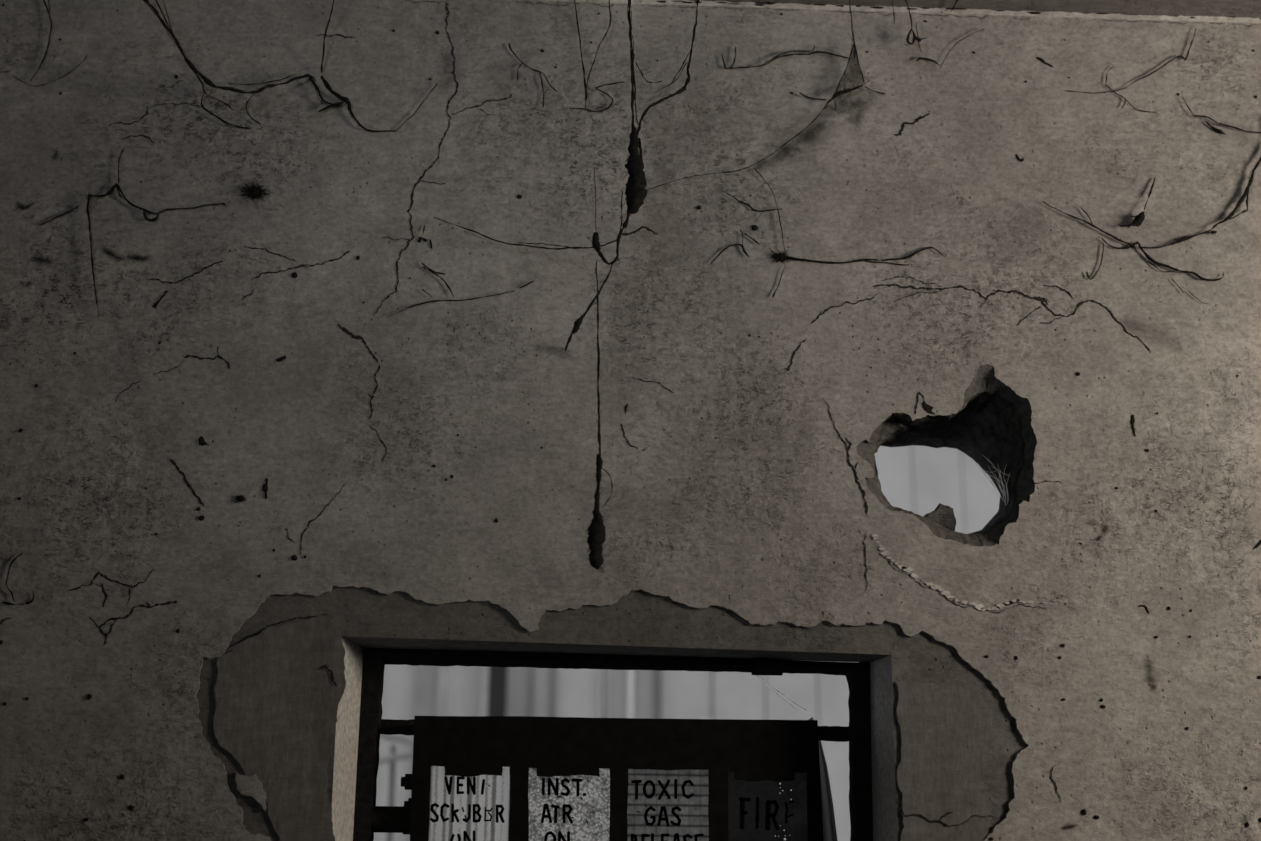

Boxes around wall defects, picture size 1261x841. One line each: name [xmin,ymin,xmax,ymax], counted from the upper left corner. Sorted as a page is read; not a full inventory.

crack [315,32,355,40]
crack [516,0,619,8]
crack [1064,18,1261,27]
crack [109,80,200,143]
crack [894,113,930,136]
crack [338,0,513,462]
crack [150,246,350,300]
hole [856,364,1037,547]
flaking render [196,586,1028,841]